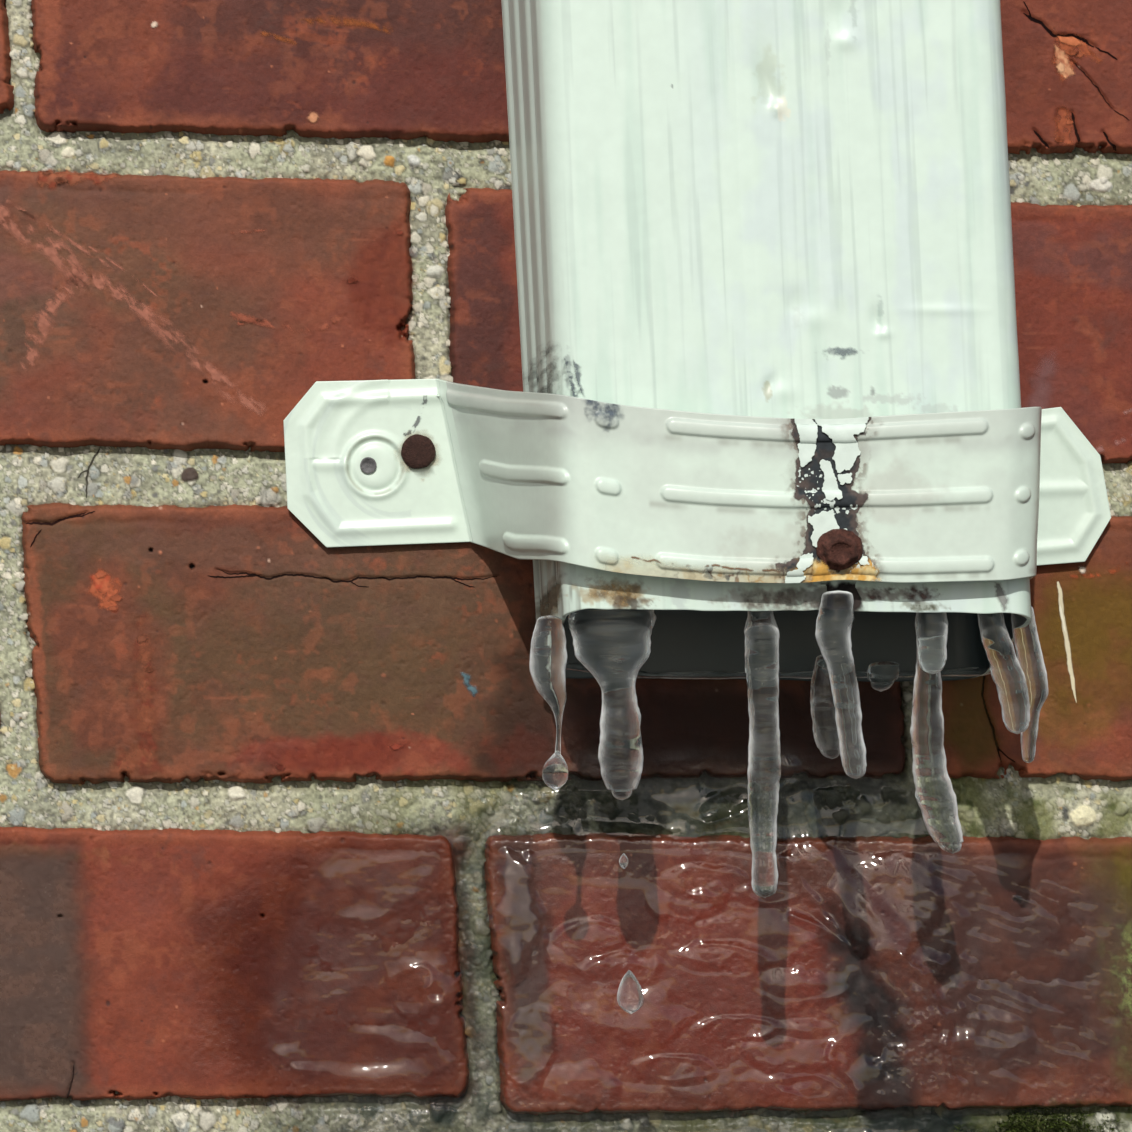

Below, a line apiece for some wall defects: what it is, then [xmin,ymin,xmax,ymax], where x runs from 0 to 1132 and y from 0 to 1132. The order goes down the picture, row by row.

crack [1023,1,1129,151]
peeling [775,417,879,583]
crack [210,569,497,587]
corrosion [593,557,787,605]
corrosion [801,519,880,583]
damp [556,781,750,834]
damp [777,781,904,836]
damp [950,874,1111,1084]
damp [832,926,912,1112]